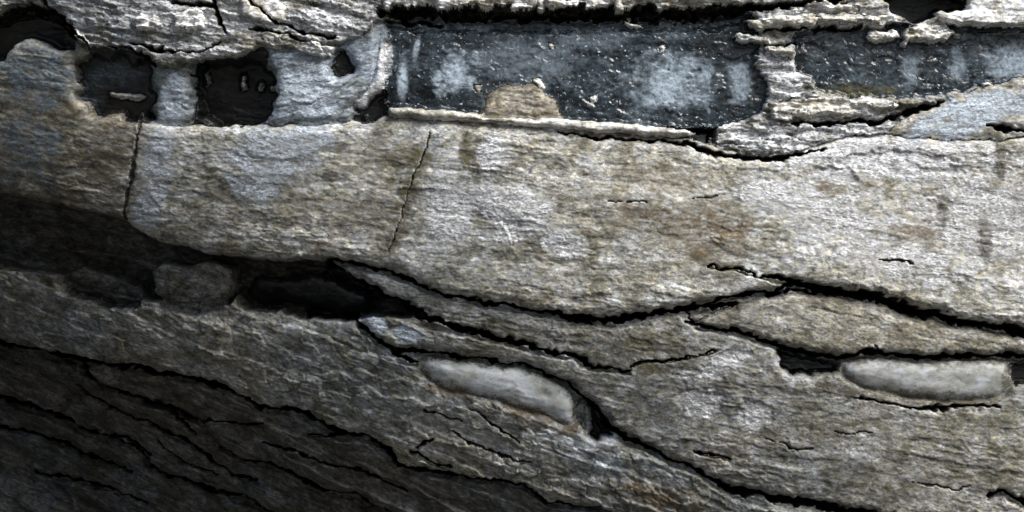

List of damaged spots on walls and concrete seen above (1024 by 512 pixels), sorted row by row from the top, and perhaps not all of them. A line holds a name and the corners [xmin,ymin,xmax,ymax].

peeling [239,0,287,25]
peeling [537,0,546,16]
peeling [613,0,643,29]
peeling [732,0,1024,59]
peeling [291,41,337,59]
peeling [241,76,265,92]
crack [122,117,144,220]
crack [326,132,1024,512]
crack [0,338,600,512]